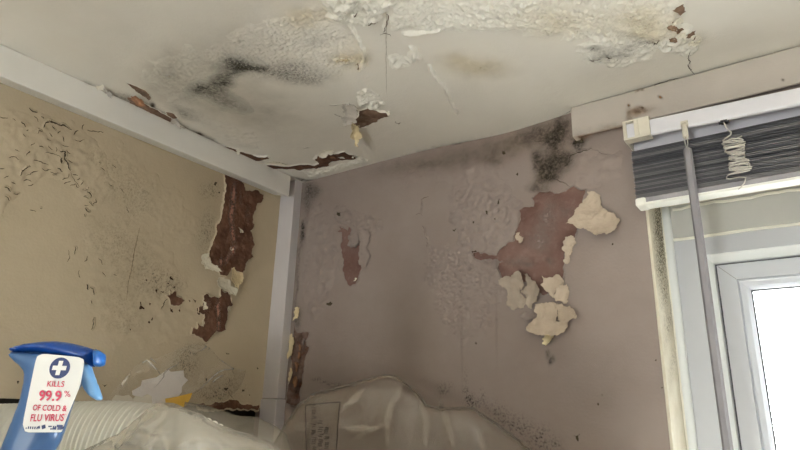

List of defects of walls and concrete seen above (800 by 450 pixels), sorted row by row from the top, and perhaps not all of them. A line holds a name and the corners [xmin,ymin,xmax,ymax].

flaking render [321,0,392,27]
flaking render [124,81,187,129]
mould [195,59,264,95]
peeling [223,88,391,171]
flaking render [155,174,264,343]
peeling [337,225,371,288]
peeling [472,184,620,346]
flaking render [286,307,311,408]